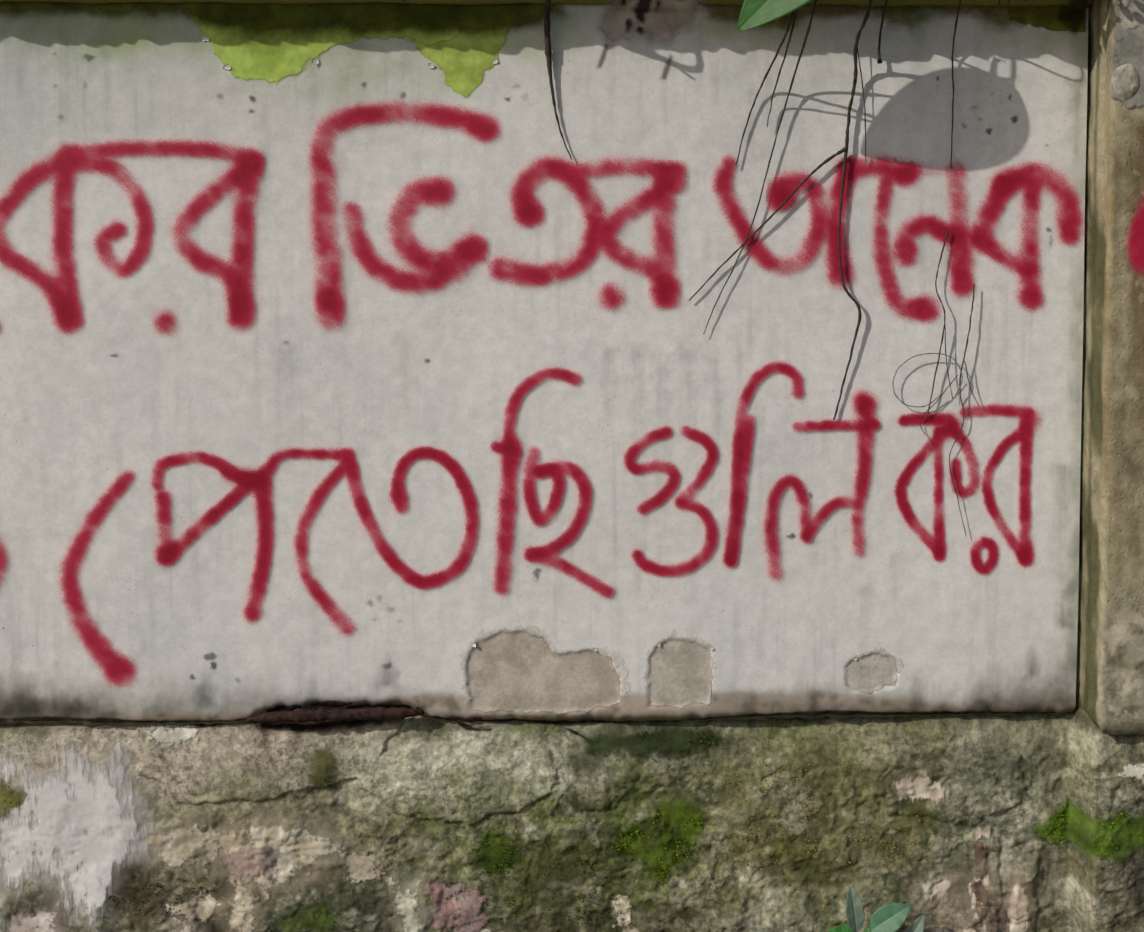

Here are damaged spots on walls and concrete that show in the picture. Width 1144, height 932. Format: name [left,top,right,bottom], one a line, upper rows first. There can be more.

peeling [194,18,511,97]
spalling [598,0,696,67]
peeling [1108,0,1144,109]
spalling [459,626,630,714]
spalling [643,630,716,709]
spalling [845,648,904,694]
leakage [0,698,113,719]
rust [247,700,424,731]
peeling [893,773,949,805]
peeling [975,825,991,840]
peeling [922,875,1032,932]